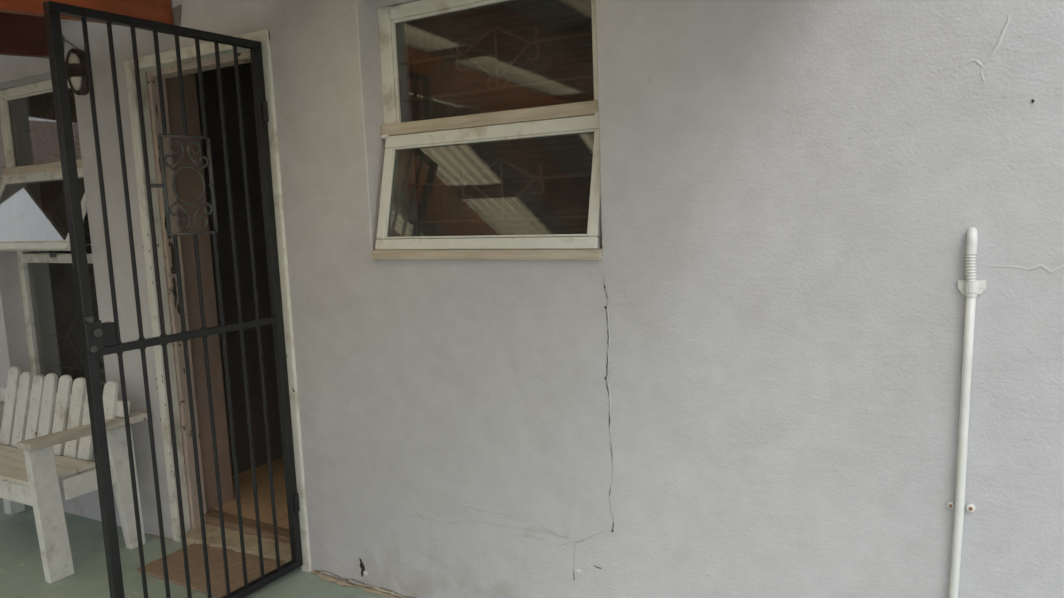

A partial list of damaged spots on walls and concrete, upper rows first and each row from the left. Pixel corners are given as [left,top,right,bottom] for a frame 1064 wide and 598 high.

crack [557,283,614,575]
peeling [311,558,414,598]